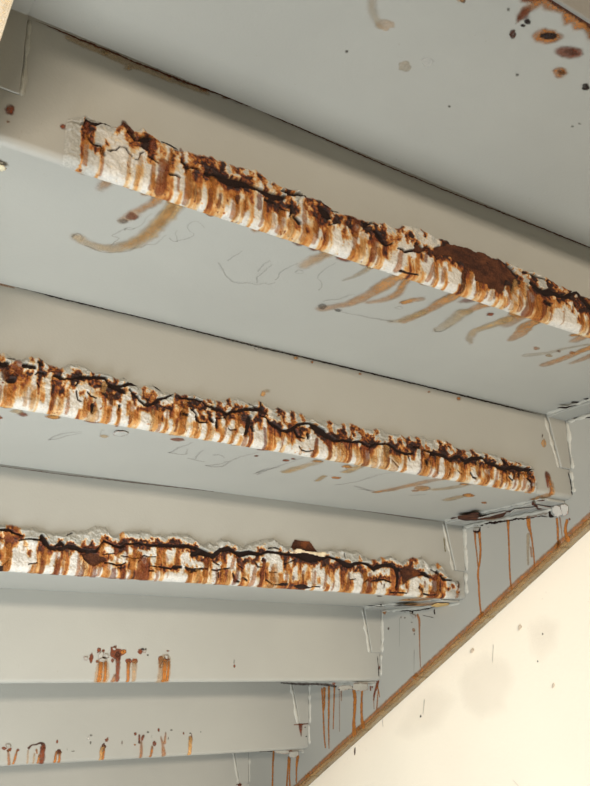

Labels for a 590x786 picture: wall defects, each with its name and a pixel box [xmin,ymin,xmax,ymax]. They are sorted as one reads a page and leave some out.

corrosion [509,0,590,39]
corrosion [534,29,581,58]
corrosion [118,193,182,250]
peeling [60,115,590,338]
corrosion [408,294,540,337]
crack [1,284,536,414]
peeling [0,353,568,532]
peeling [0,524,460,635]
corrosion [84,646,149,682]
corrosion [158,650,170,682]
corrosion [286,513,590,786]
corrosion [2,740,62,765]